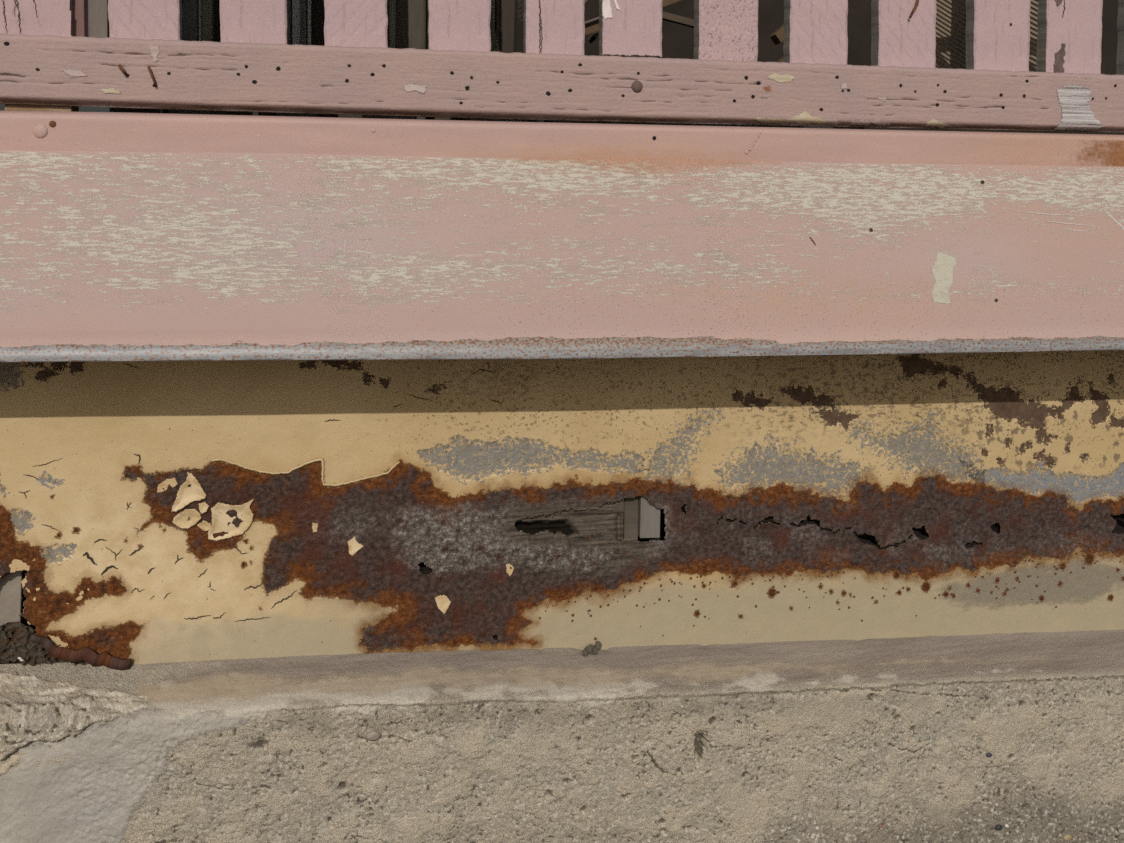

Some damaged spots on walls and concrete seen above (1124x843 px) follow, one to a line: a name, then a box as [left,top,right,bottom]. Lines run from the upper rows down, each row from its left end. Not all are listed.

peeling [1054,85,1104,131]
peeling [0,152,1124,320]
peeling [417,405,726,486]
peeling [712,354,1124,505]
peeling [39,543,76,565]
corrosion [0,505,145,671]
peeling [157,472,254,541]
peeling [347,536,364,556]
corrosion [120,459,1124,654]
crack [717,516,913,550]